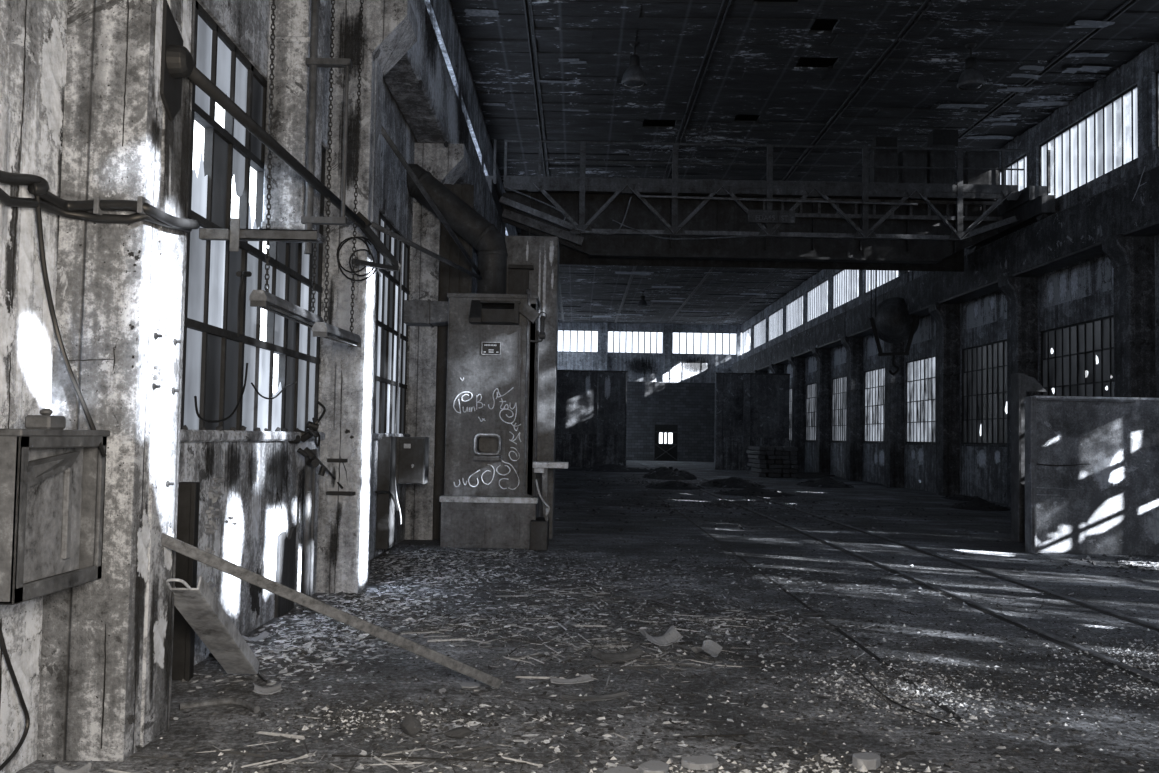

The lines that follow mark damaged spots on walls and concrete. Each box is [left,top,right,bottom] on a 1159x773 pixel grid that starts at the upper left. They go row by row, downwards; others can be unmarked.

peeling [464,9,499,17]
leakage [0,49,60,429]